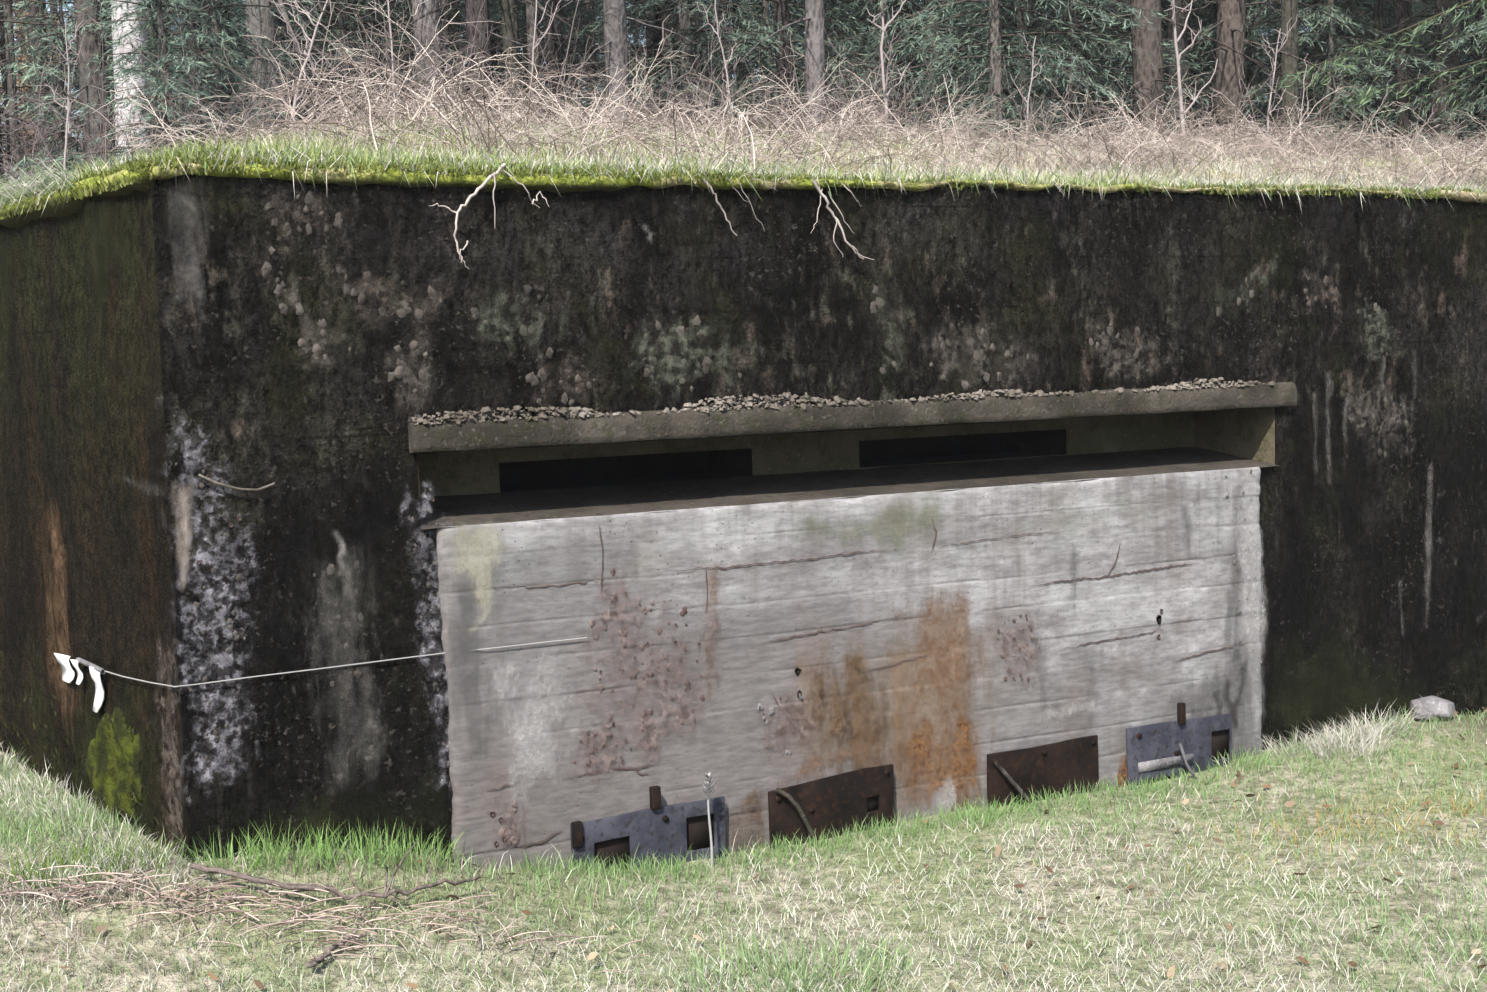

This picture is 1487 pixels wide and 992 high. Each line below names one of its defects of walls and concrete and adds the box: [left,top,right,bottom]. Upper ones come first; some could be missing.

corrosion [906,720,977,800]